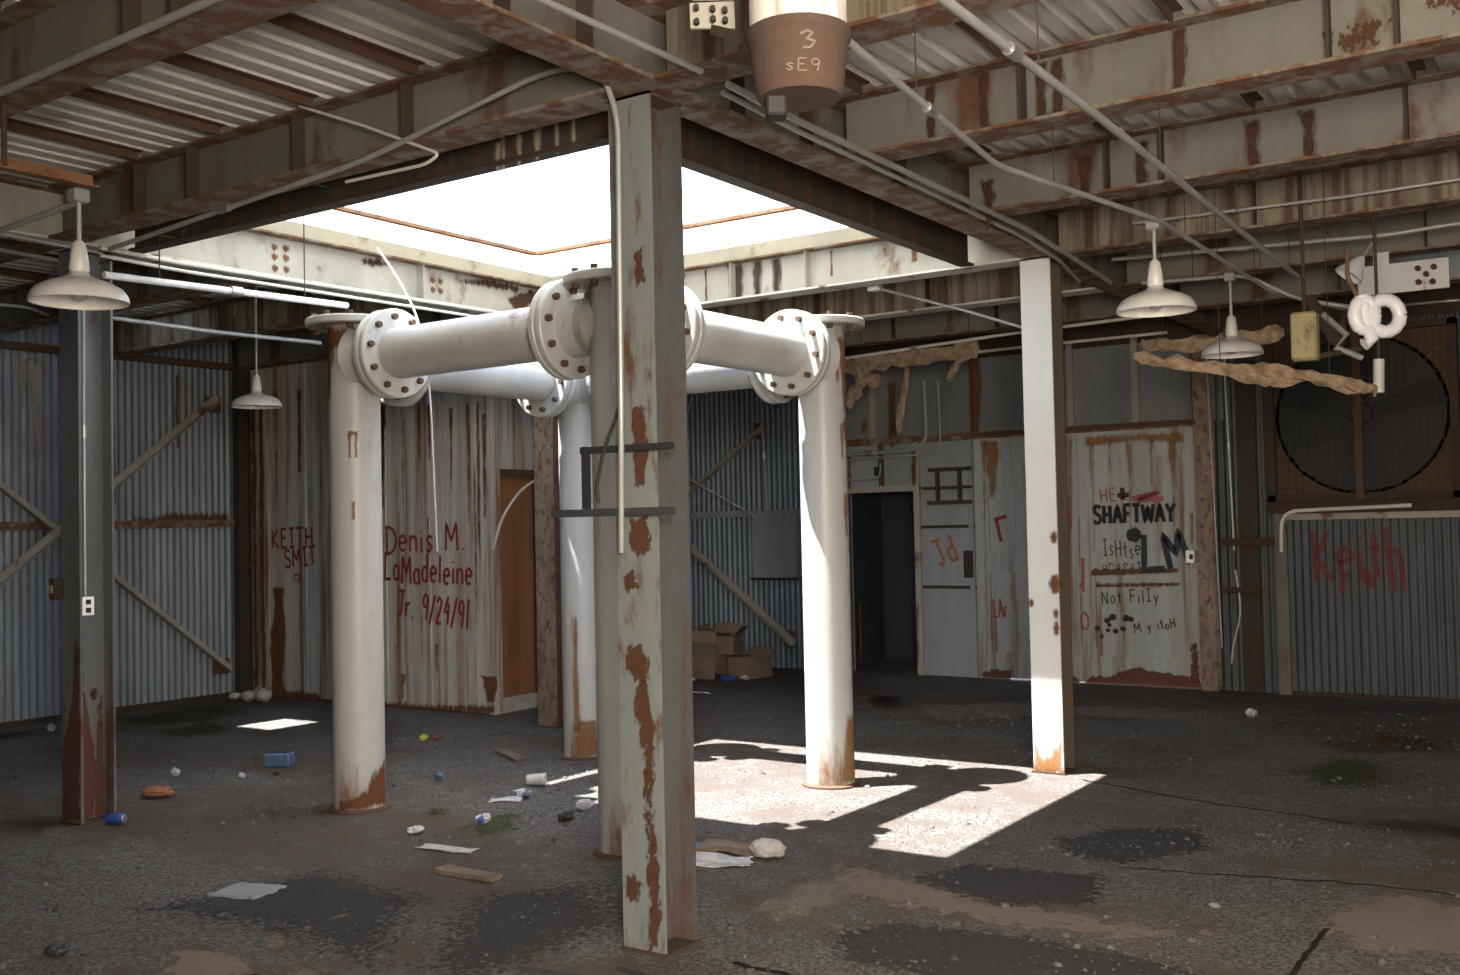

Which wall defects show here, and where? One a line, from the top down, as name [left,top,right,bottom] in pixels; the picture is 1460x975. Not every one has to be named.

rust [1425,0,1460,15]
rust [1322,18,1391,53]
rust [842,714,855,783]
rust [340,761,386,810]
crack [1119,867,1455,896]
crack [732,961,792,975]
crack [1288,928,1330,975]